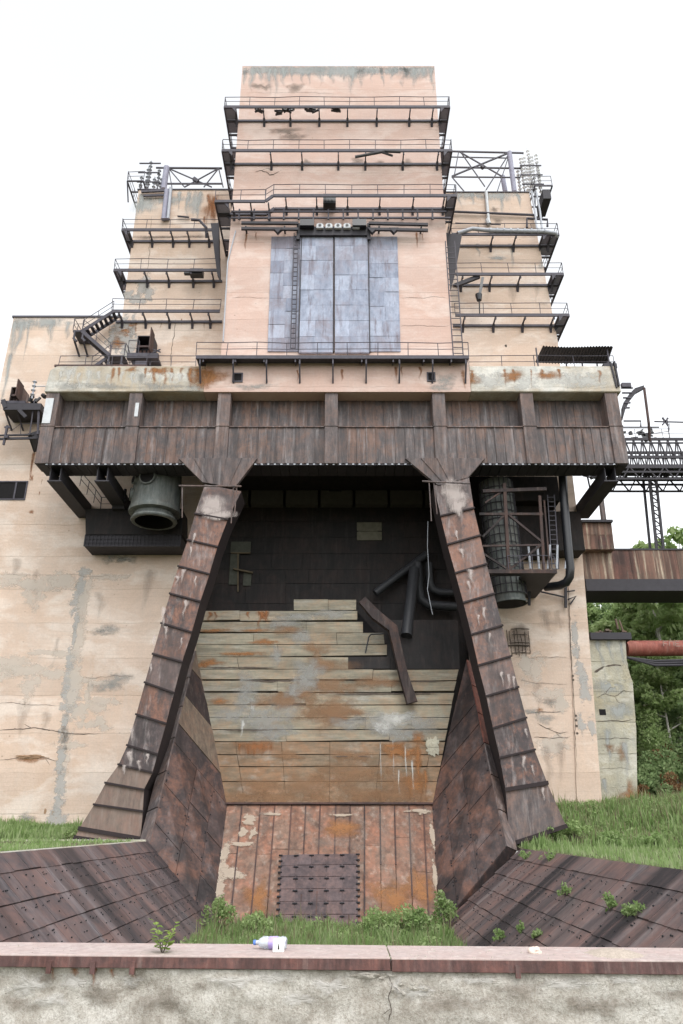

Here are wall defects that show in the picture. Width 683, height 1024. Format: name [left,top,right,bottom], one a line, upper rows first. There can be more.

water stain [243,66,433,89]
corrosion [112,367,226,386]
corrosion [503,369,560,382]
corrosion [198,611,296,667]
corrosion [265,644,395,724]
crack [522,601,635,764]
crack [5,702,98,737]
corrosion [343,735,427,802]